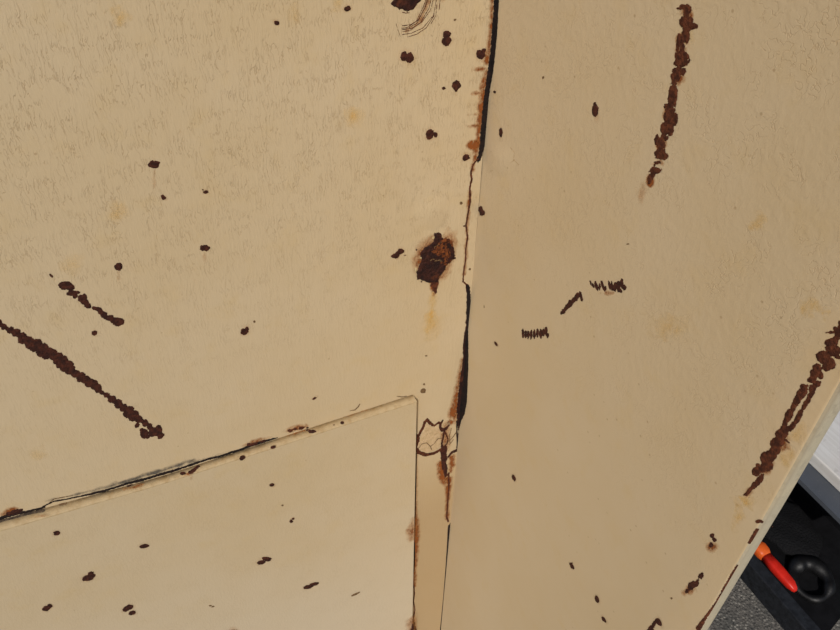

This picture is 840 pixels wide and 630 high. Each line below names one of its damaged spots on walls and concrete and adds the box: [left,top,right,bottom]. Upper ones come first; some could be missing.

peeling [391,0,421,12]
crack [449,0,499,448]
corrosion [391,232,456,294]
corrosion [589,278,627,294]
corrosion [560,291,583,315]
corrosion [521,327,549,340]
corrosion [416,416,458,490]
crack [440,472,452,630]
corrosion [683,572,704,594]